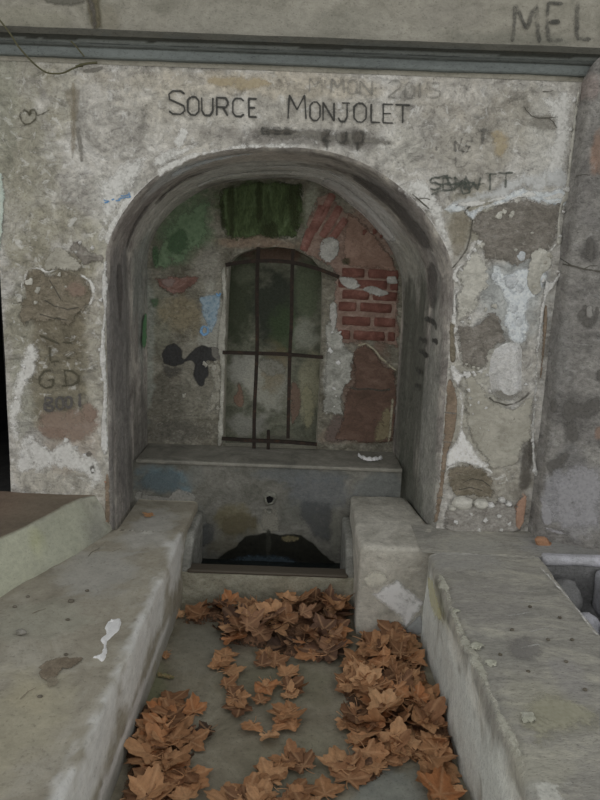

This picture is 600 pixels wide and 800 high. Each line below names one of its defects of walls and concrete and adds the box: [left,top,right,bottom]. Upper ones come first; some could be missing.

spalling [466,196,565,266]
spalling [16,267,103,326]
flaking render [300,193,399,443]
spalling [449,304,506,372]
spalling [433,379,527,532]